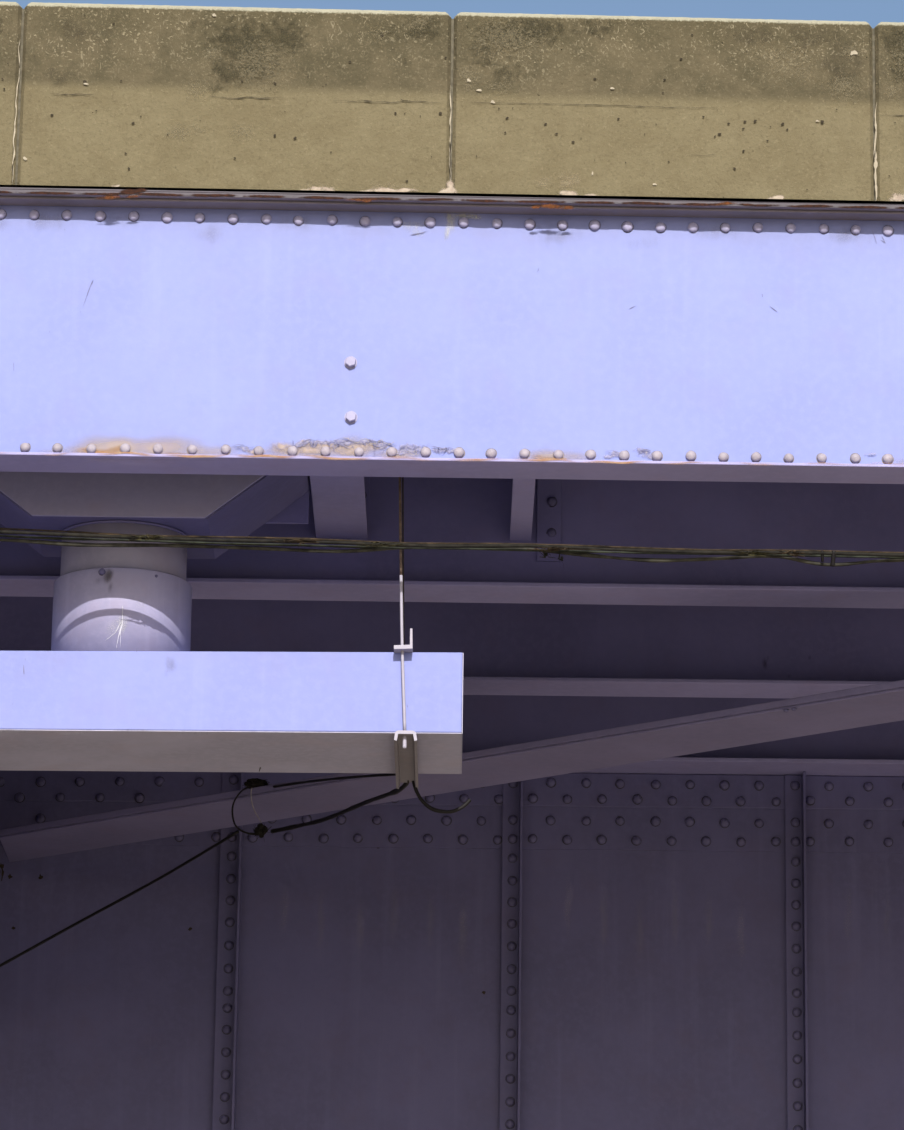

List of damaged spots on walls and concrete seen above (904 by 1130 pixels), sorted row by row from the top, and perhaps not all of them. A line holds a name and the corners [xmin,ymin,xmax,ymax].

corrosion [77,440,215,457]
corrosion [247,445,365,460]